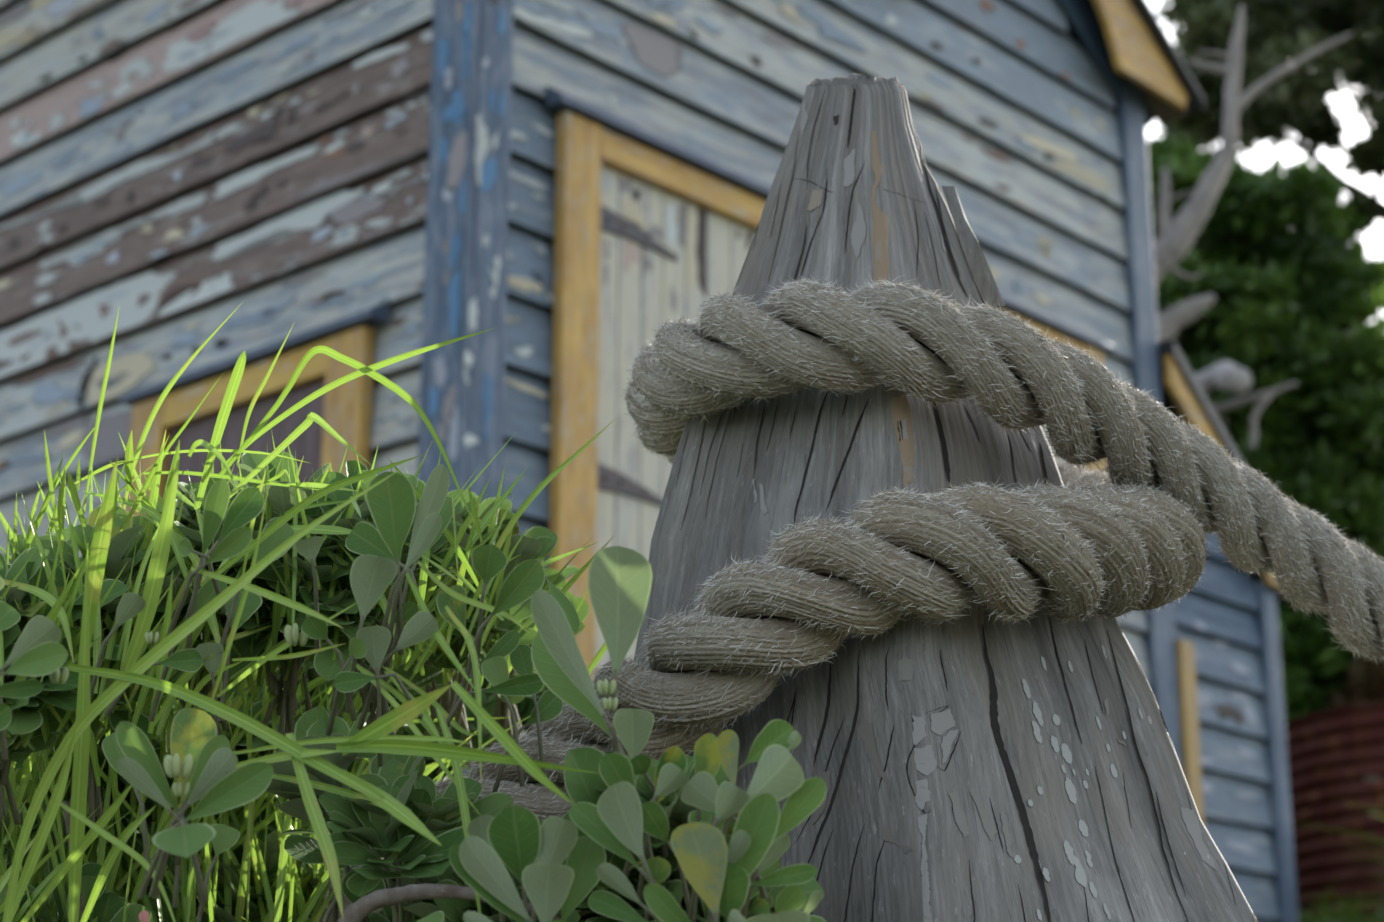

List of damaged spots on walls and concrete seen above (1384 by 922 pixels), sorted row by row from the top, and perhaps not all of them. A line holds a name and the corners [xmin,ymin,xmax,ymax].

peeling [85,0,304,100]
peeling [351,29,433,93]
peeling [514,0,593,38]
peeling [510,170,549,201]
peeling [0,96,430,387]
peeling [513,345,534,359]
crack [787,624,1051,922]
crack [1050,619,1191,922]